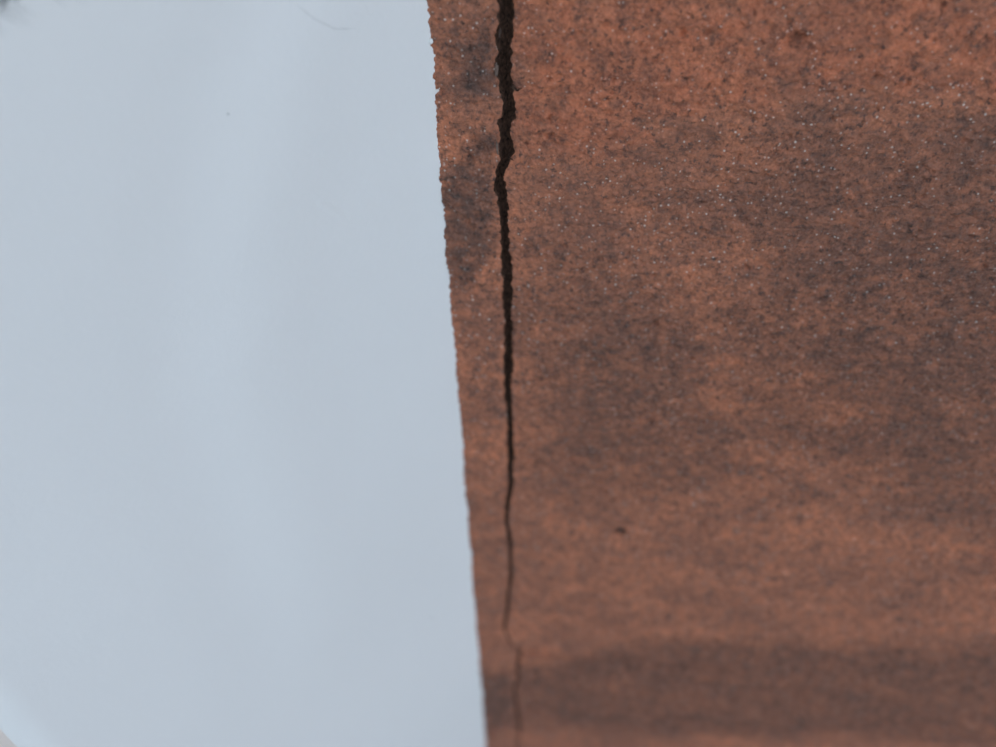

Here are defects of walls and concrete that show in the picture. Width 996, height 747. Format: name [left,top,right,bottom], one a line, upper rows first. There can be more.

crack [493,0,522,747]